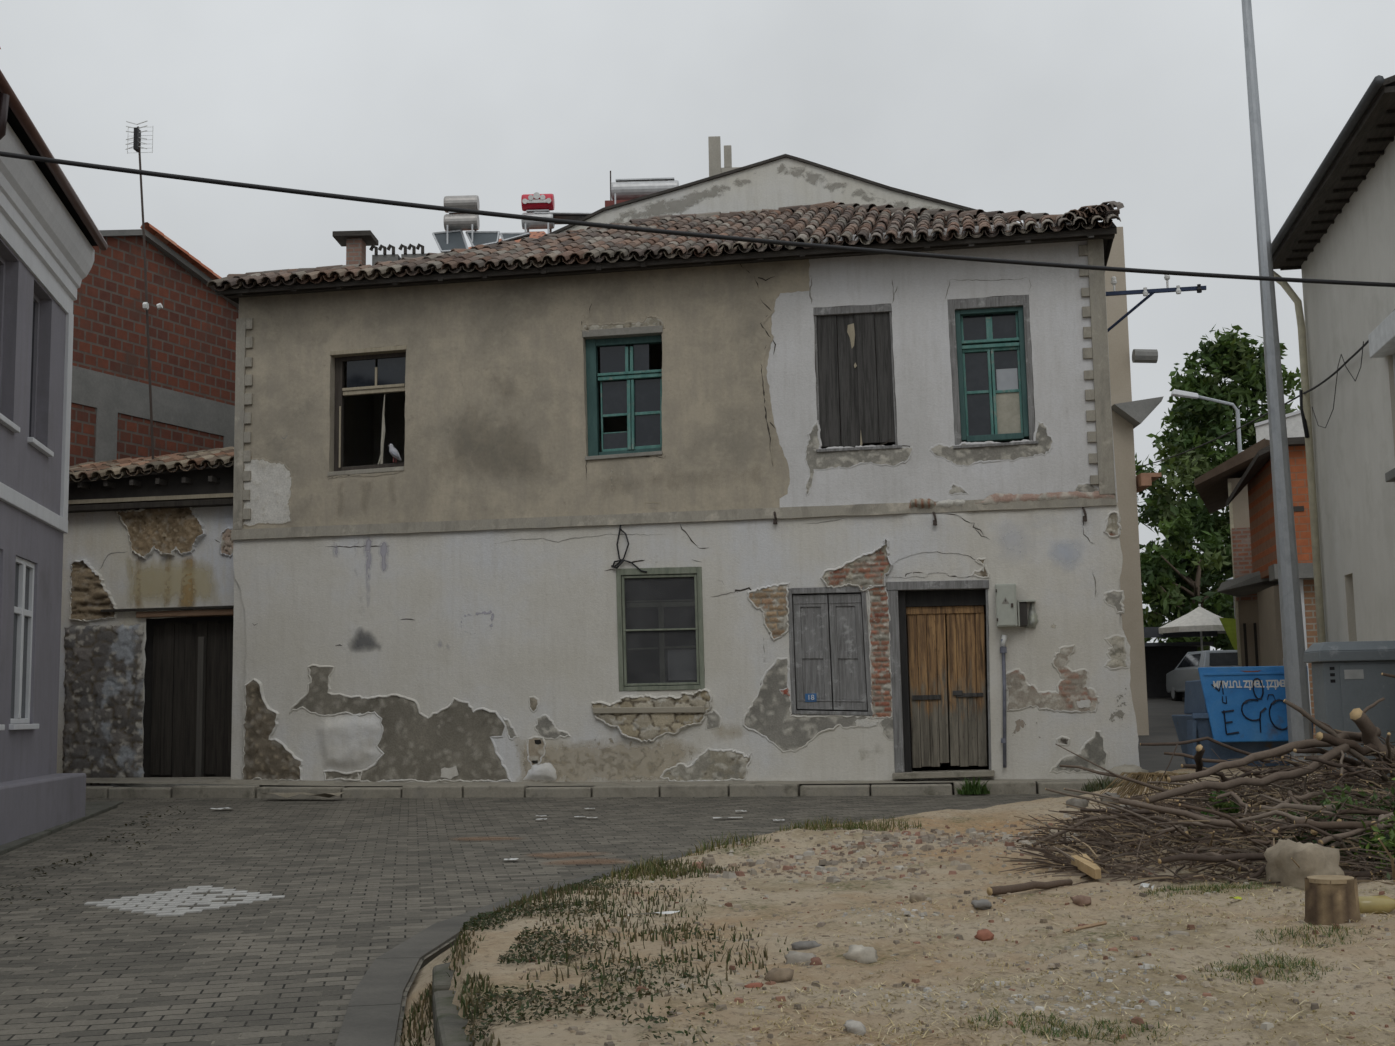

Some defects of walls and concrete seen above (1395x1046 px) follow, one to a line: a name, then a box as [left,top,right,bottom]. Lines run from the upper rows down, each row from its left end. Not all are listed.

spalling [116,501,234,560]
water stain [135,558,211,607]
flaking render [747,583,790,641]
flaking render [820,537,894,729]
spalling [1103,589,1125,614]
flaking render [1006,634,1129,746]
peeling [242,664,753,782]